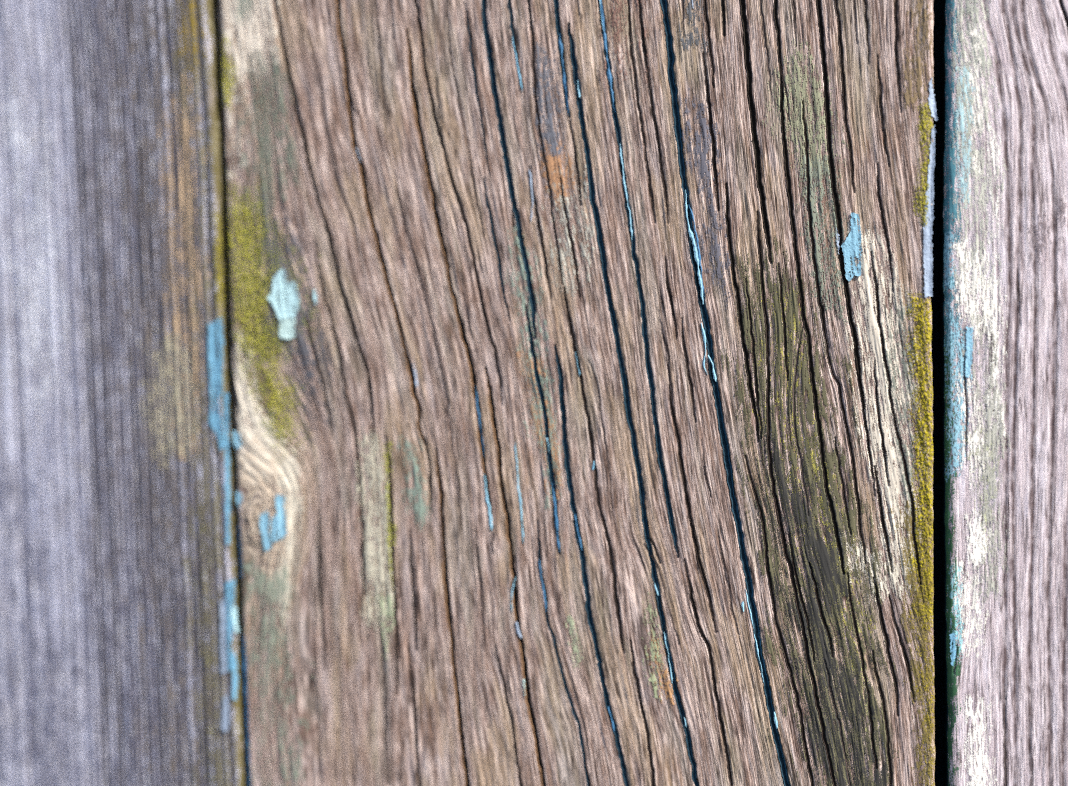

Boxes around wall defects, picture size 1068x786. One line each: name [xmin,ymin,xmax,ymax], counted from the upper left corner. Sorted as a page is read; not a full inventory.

damp [0,0,345,786]
peeling [208,317,251,786]
peeling [259,494,287,551]
peeling [266,269,300,340]
crack [274,0,921,786]
damp [752,418,889,786]
peeling [836,213,862,281]
damp [882,299,922,527]
peeling [923,0,977,482]
peeling [946,566,964,666]